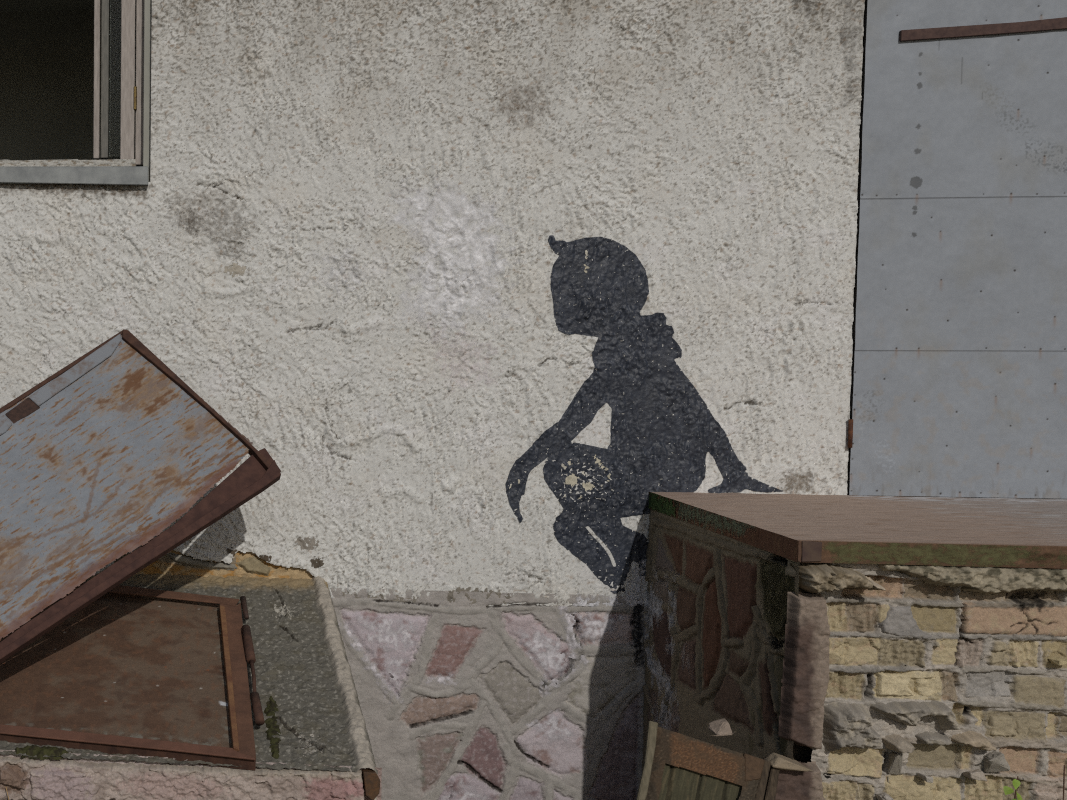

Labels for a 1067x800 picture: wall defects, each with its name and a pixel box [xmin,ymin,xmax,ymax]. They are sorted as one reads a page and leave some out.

spalling [785,559,886,593]
spalling [878,564,1067,595]
crack [1010,609,1052,634]
rust [0,591,232,748]
spalling [874,670,940,697]
spalling [875,751,1010,800]